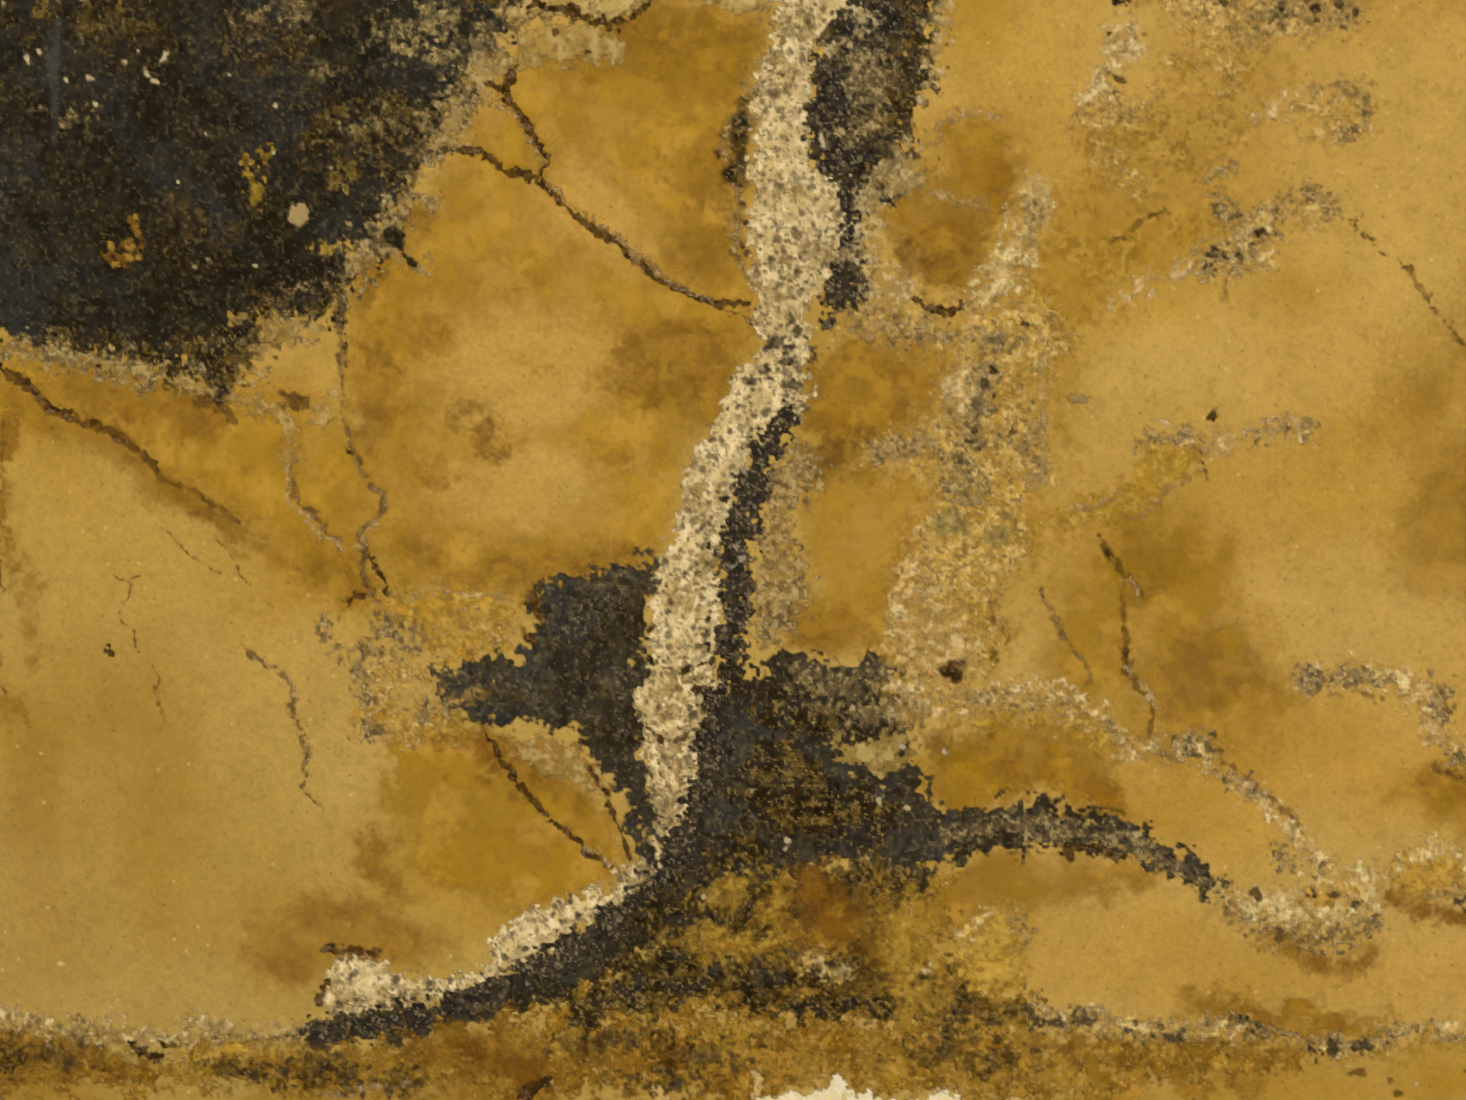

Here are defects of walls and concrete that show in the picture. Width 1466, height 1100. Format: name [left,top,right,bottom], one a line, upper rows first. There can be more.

crack [445,59,752,324]
water stain [1070,0,1376,284]
crack [0,362,240,523]
crack [283,269,389,605]
crack [1040,534,1154,724]
crack [485,733,632,887]
water stain [1291,651,1466,820]
water stain [927,854,1053,995]
water stain [0,1003,108,1044]
spalling [756,1074,896,1100]
spalling [917,1090,960,1100]
water stain [1014,995,1466,1100]